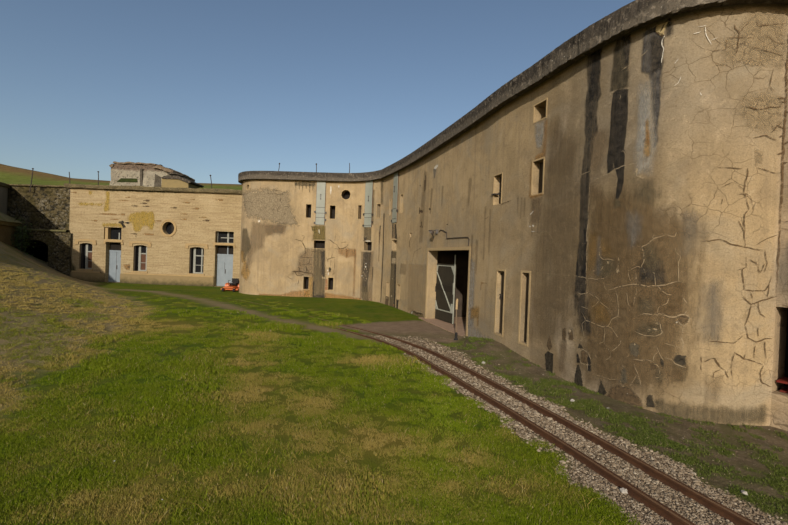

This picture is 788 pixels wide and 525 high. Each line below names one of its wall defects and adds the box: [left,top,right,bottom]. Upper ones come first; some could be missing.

flaking render [243,188,297,226]
leakage [575,18,691,387]
crack [570,22,788,391]
leakage [241,225,284,279]
leakage [661,402,765,424]